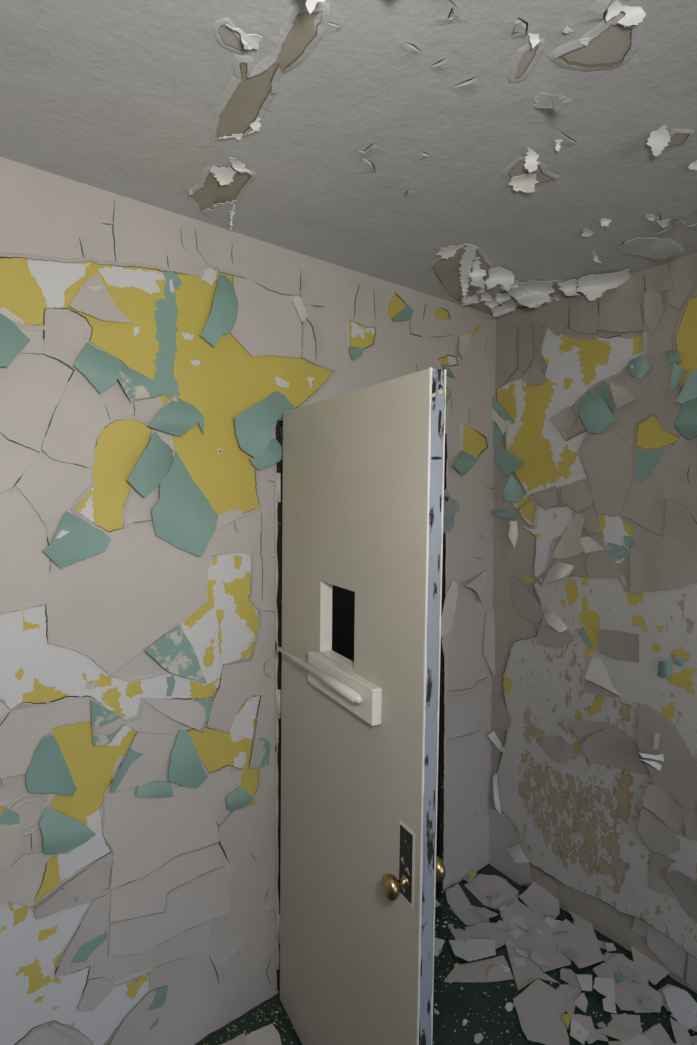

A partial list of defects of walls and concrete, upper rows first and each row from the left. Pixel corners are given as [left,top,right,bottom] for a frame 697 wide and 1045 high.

peeling [0,252,337,1045]